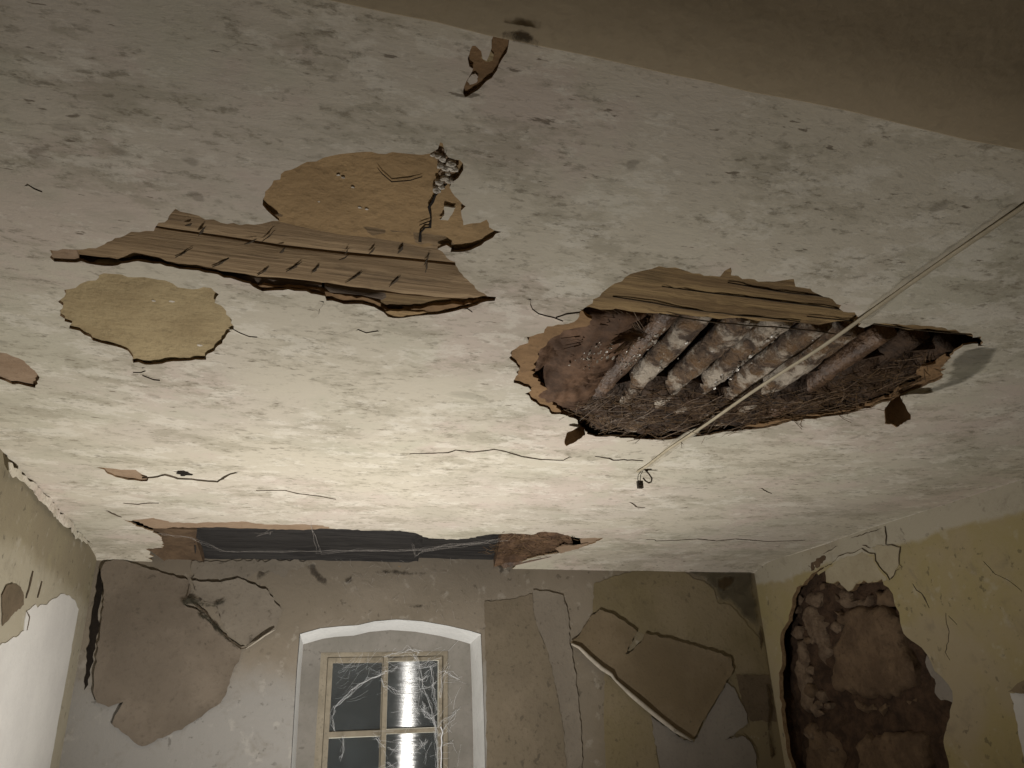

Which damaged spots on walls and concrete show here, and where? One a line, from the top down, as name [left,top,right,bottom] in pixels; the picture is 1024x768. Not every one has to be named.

flaking render [463,37,509,94]
flaking render [263,142,496,250]
flaking render [60,259,234,363]
flaking render [253,282,495,317]
flaking render [510,307,668,446]
flaking render [742,334,979,428]
crack [410,449,643,462]
flaking render [133,518,332,562]
flaking render [493,532,601,568]
crack [646,527,957,661]
flaking render [0,583,79,768]
spalling [736,545,953,768]